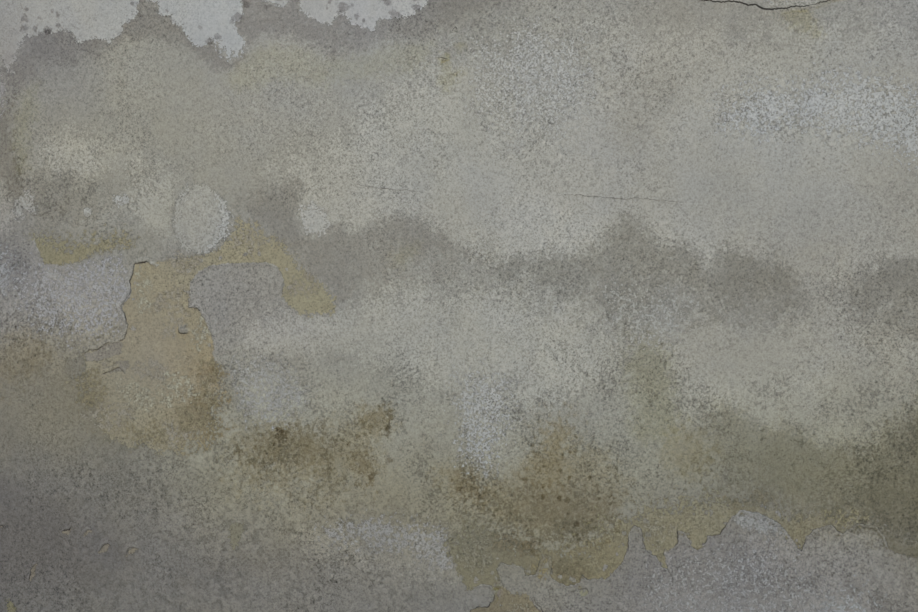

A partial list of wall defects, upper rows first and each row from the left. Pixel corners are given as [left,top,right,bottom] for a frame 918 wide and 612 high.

crack [699,0,847,16]
damp [452,7,608,165]
efflorescence [12,188,38,223]
peeling [29,222,140,278]
efflorescence [298,197,332,237]
peeling [63,216,338,460]
damp [587,271,711,367]
efflorescence [440,356,528,481]
efflorescence [313,507,455,582]
peeling [442,484,918,612]